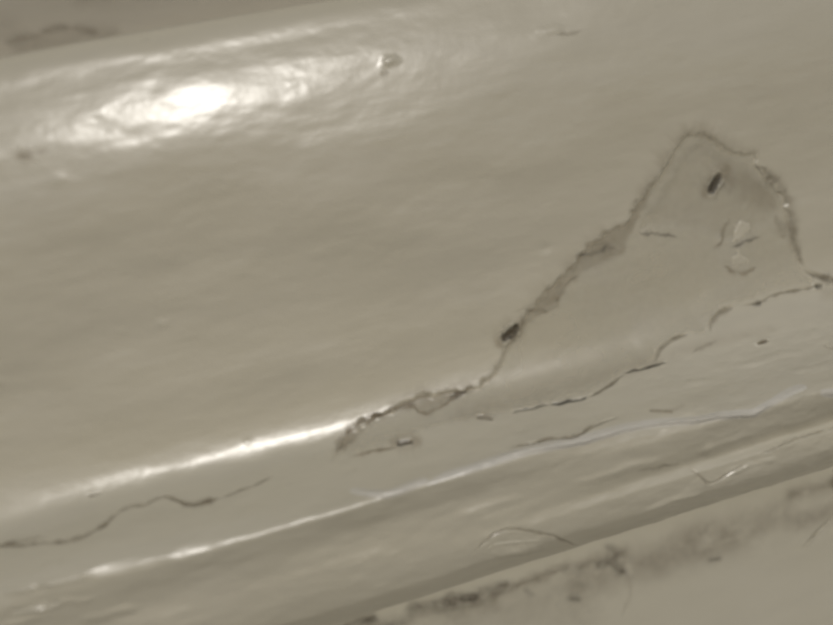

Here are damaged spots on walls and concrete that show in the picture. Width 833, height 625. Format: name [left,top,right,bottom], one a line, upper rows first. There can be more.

peeling [350,384,807,499]
crack [514,363,662,413]